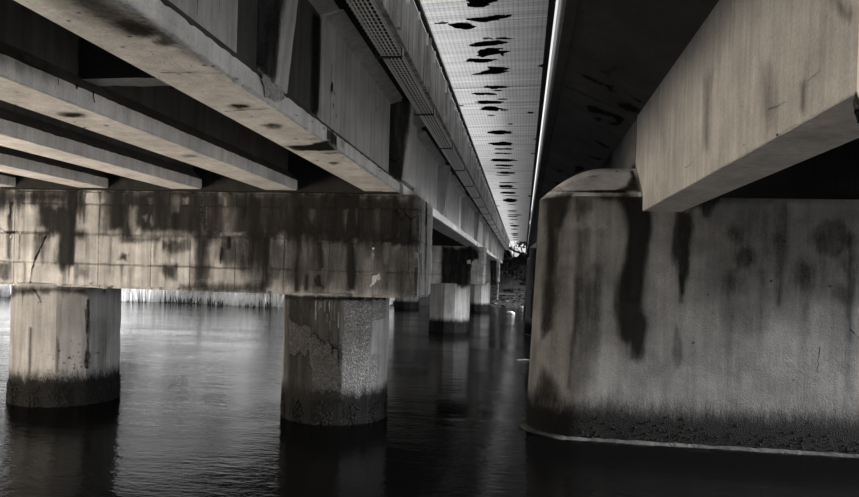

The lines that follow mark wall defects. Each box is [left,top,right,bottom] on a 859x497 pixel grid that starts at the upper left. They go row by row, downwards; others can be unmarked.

leakage [285,127,337,154]
leakage [388,101,410,181]
crack [29,236,46,303]
leakage [0,188,85,278]
leakage [12,287,87,296]
leakage [104,189,431,404]
leakage [441,246,479,287]
leakage [531,170,652,357]
leakage [672,212,693,294]
leakage [700,199,718,217]
leakage [534,372,557,402]